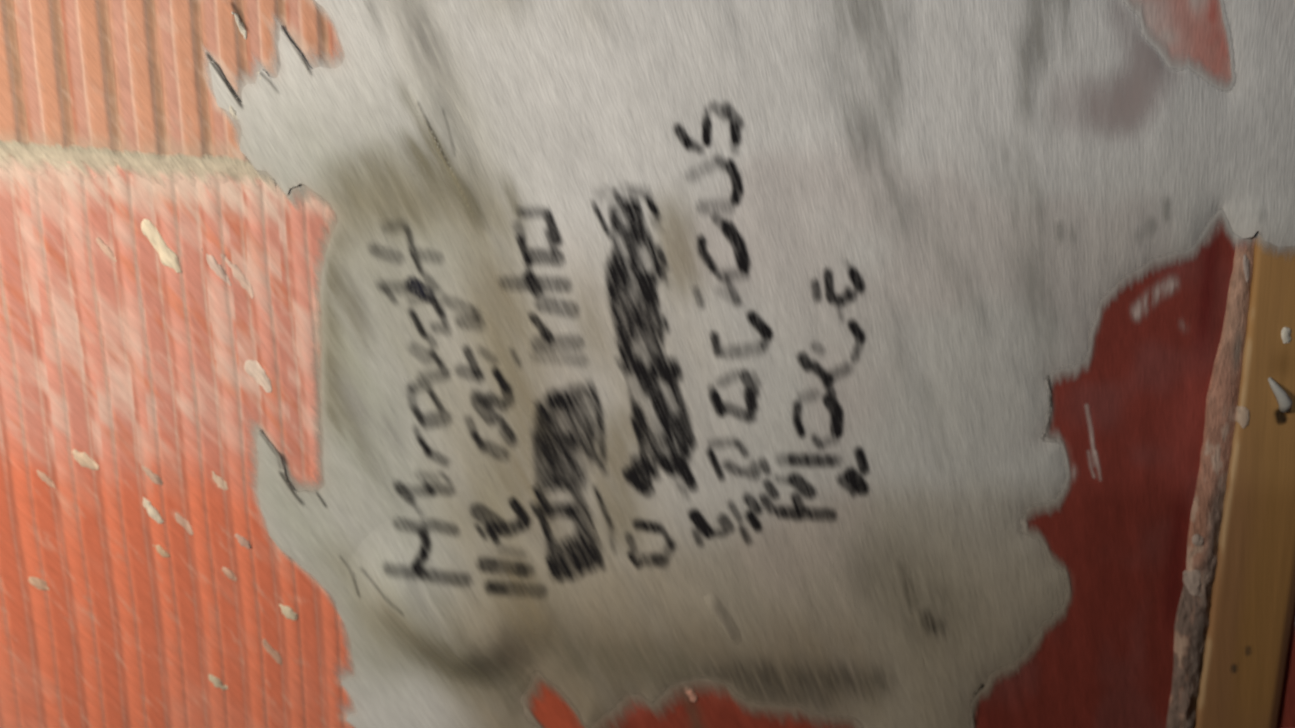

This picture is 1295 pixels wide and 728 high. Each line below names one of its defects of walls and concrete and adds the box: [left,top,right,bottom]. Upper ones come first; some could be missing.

peeling [1129,0,1232,85]
peeling [0,0,355,728]
peeling [974,219,1236,728]
peeling [528,681,585,728]
peeling [601,685,854,728]
peeling [1277,606,1295,728]